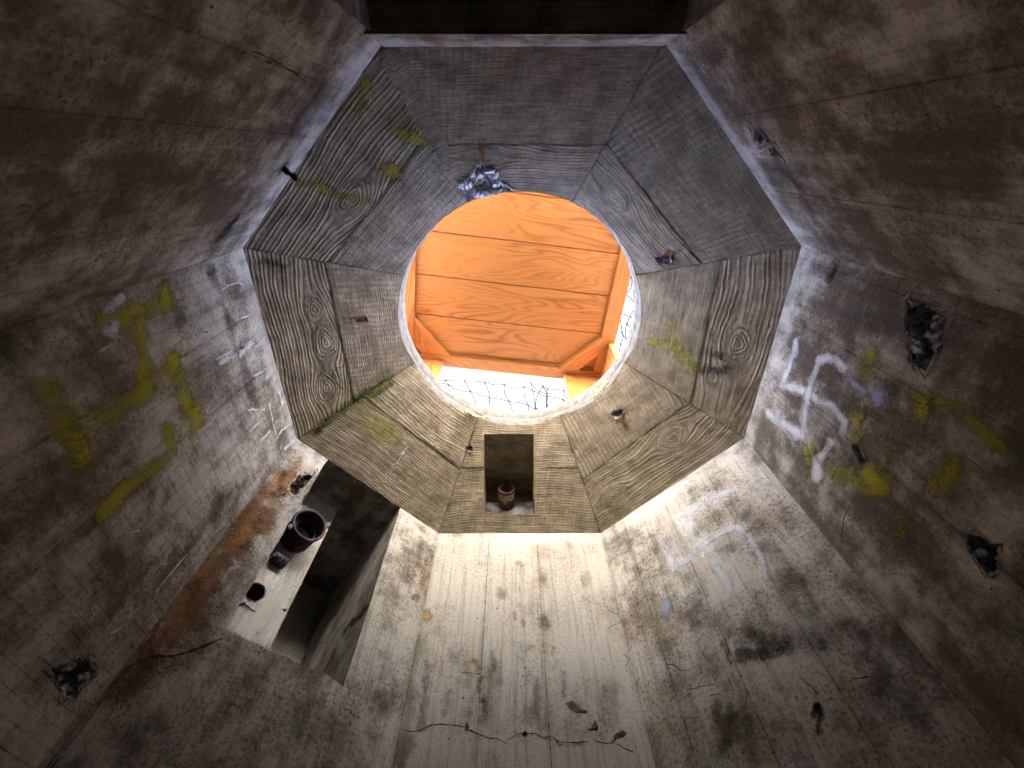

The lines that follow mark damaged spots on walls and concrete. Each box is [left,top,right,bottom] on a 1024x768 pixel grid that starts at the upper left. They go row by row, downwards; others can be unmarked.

spalling [458,143,518,201]
spalling [902,288,956,380]
corrosion [105,458,306,705]
spalling [963,528,1004,580]
spalling [43,651,100,709]
crack [122,638,223,672]
crack [402,723,633,752]